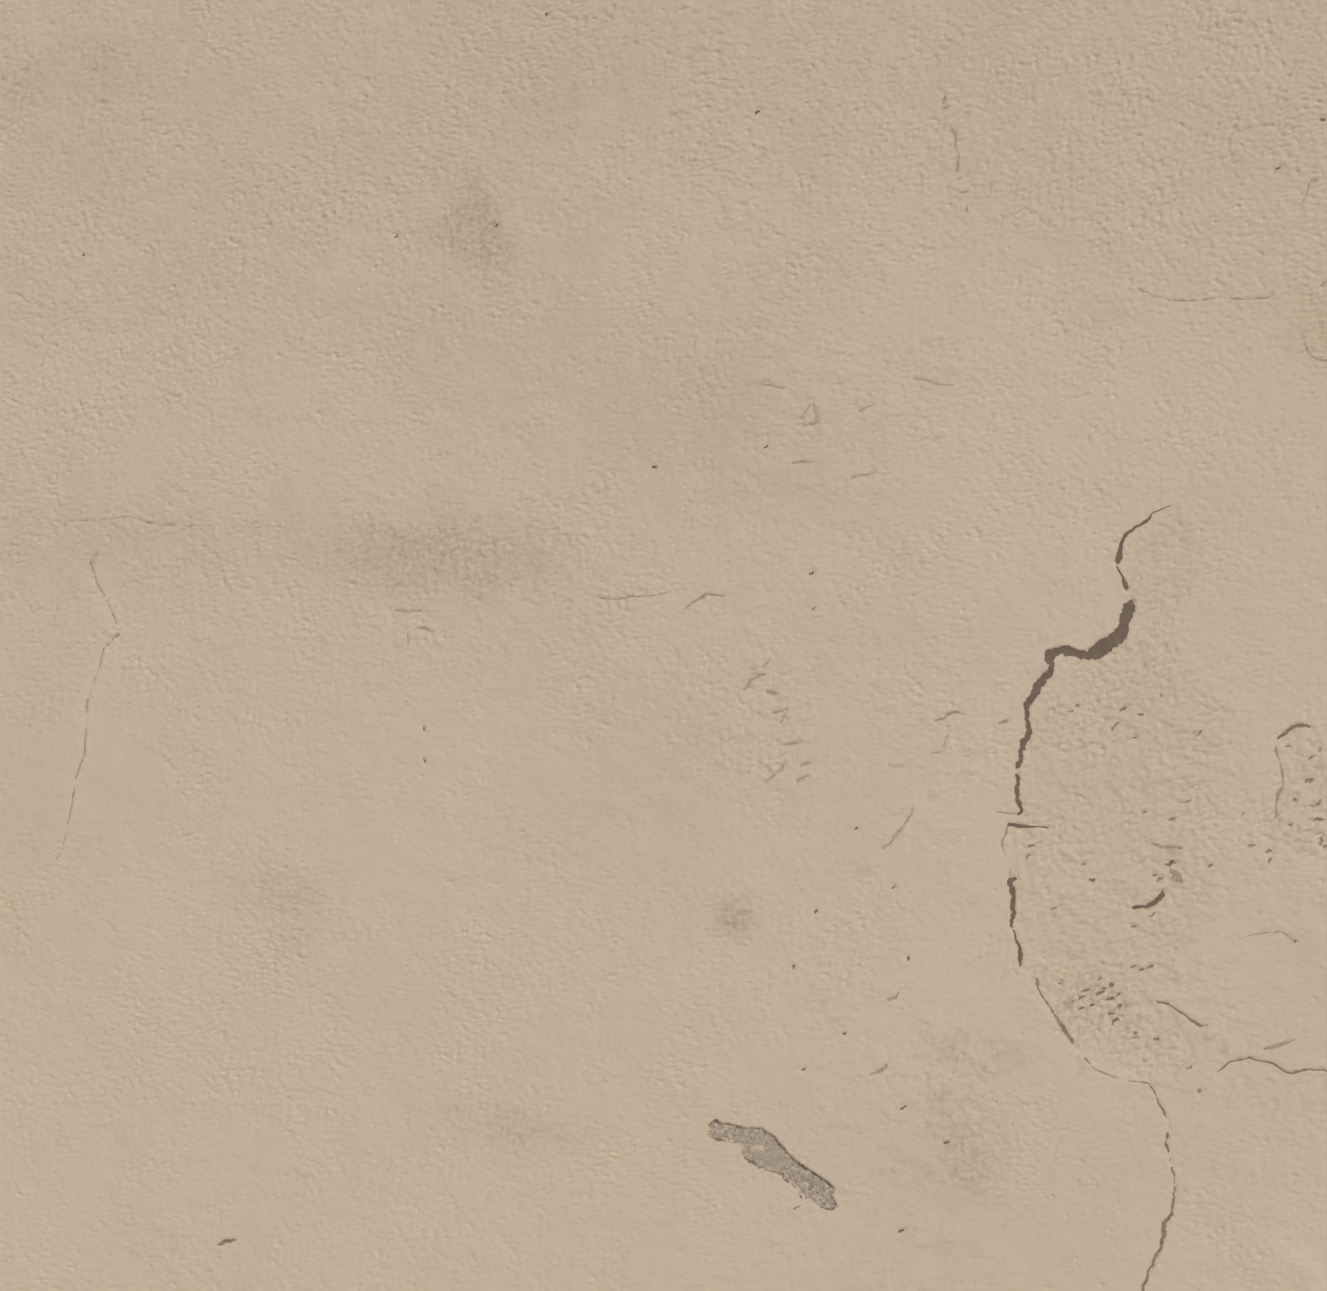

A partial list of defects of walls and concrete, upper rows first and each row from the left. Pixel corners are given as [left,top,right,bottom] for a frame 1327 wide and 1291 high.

crack [56,556,120,859]
crack [930,711,965,754]
crack [1151,842,1183,850]
crack [996,505,1176,1291]
spalling [706,1119,838,1211]